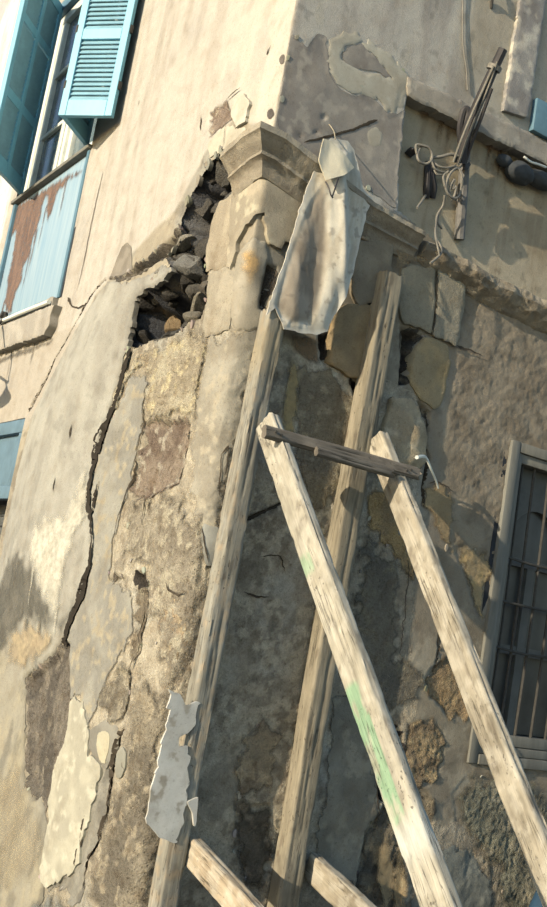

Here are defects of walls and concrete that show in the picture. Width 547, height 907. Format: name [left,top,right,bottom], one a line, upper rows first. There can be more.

flaking render [267,31,408,208]
corrosion [0,173,78,319]
crack [61,348,153,646]
spalling [25,93,302,907]
spalling [424,657,469,722]
spalling [394,718,446,821]
spalling [357,787,407,907]